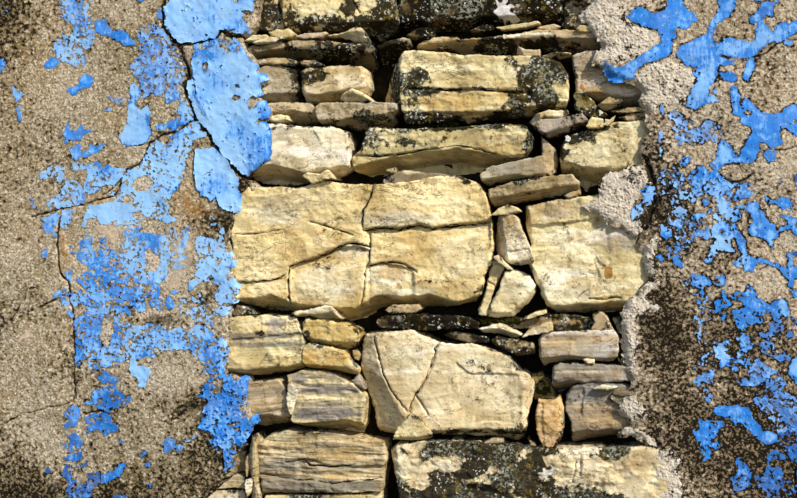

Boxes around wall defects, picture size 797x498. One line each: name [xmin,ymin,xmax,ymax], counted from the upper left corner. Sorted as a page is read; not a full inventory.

crack [33,0,246,392]
crack [374,339,438,413]
peeling [578,0,797,498]